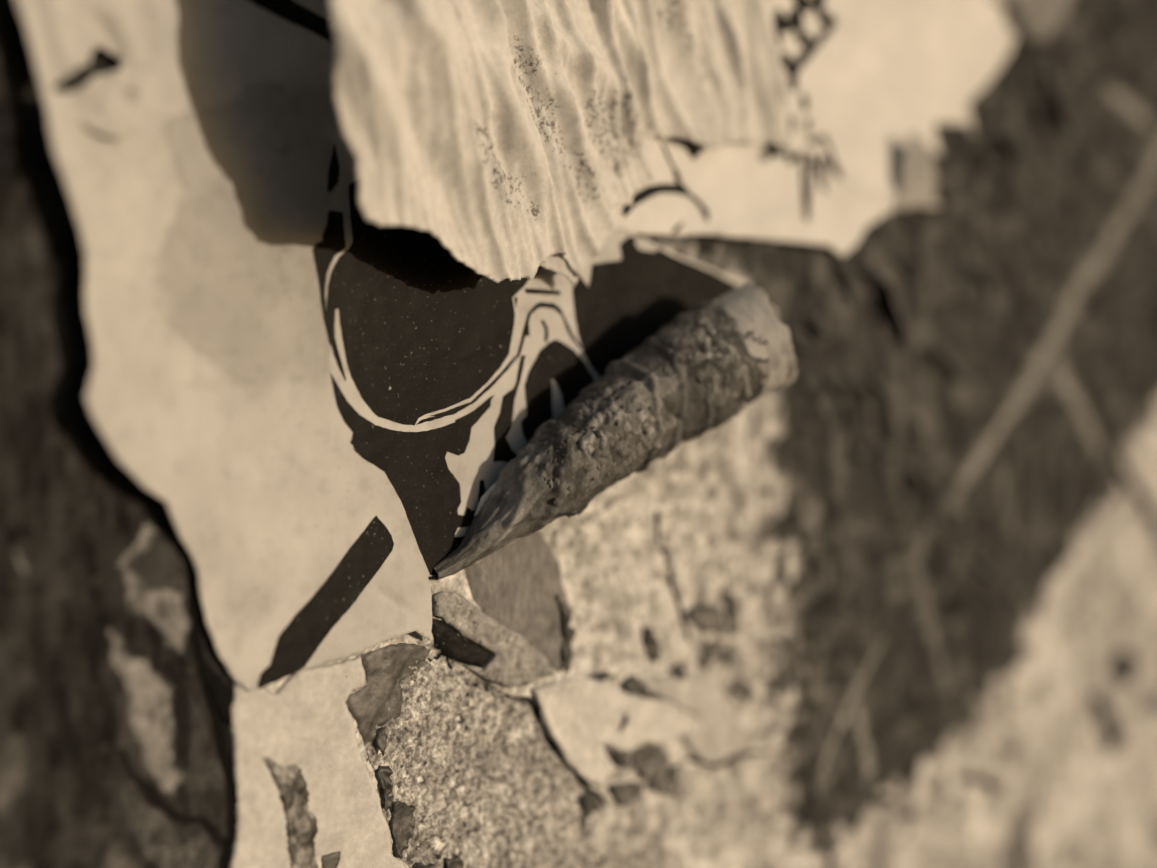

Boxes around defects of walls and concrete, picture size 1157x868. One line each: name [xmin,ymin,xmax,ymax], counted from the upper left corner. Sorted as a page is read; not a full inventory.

peeling [687,318,752,399]
spalling [556,471,740,698]
spalling [346,643,682,868]
crack [427,653,607,805]
crack [687,750,771,768]
peeling [732,680,755,702]